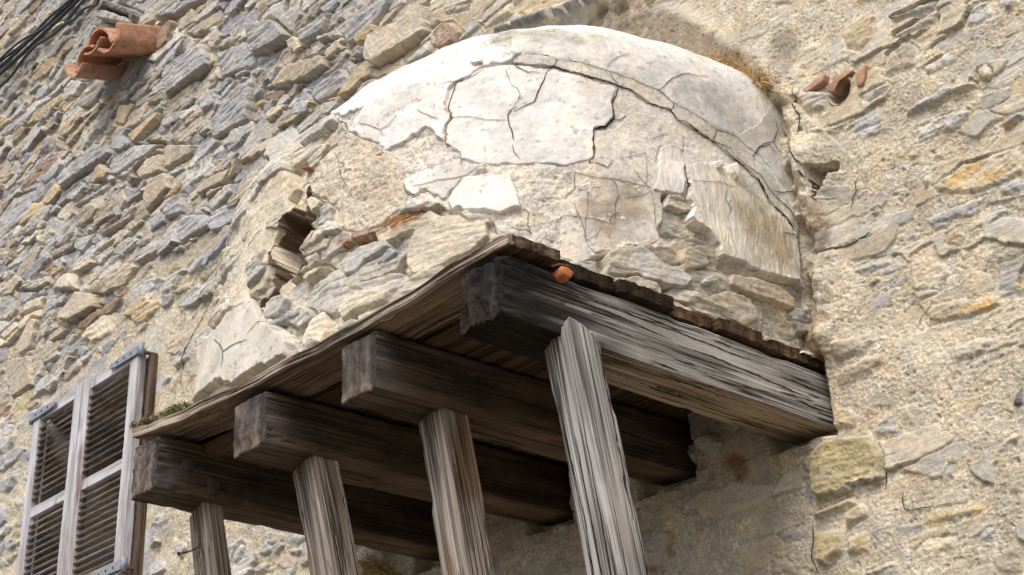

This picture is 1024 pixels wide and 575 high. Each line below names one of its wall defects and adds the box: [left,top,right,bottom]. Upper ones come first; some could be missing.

spalling [192,45,812,403]
crack [403,53,870,257]
crack [180,295,267,386]